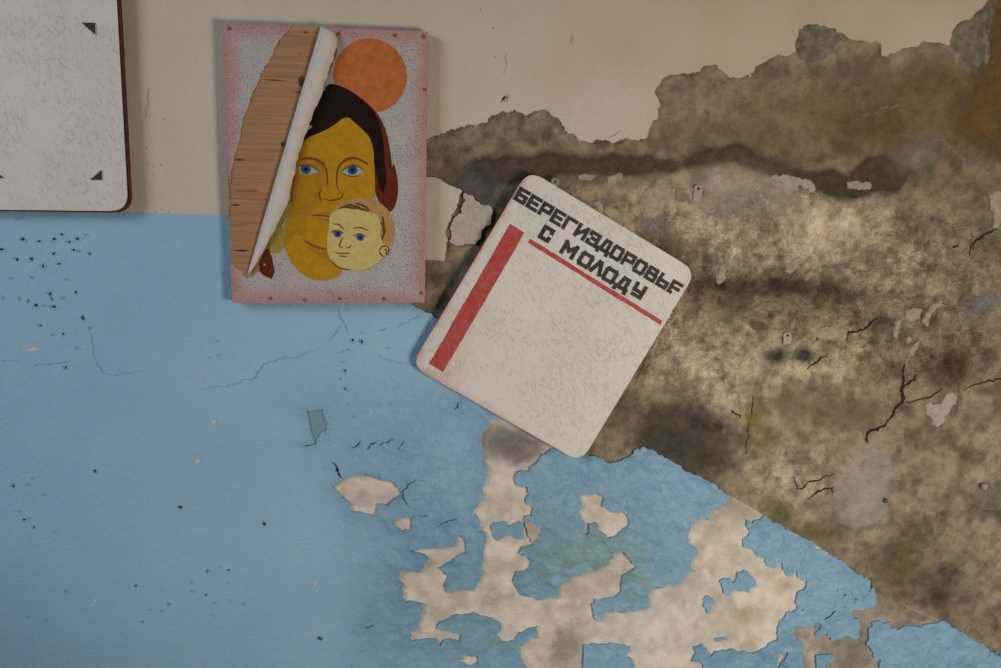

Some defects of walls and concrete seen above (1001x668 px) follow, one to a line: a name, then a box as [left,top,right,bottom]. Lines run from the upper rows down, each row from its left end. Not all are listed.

damp [458,104,1001,219]
flaking render [398,0,1001,668]
crack [865,364,1001,443]
peeling [333,465,440,531]